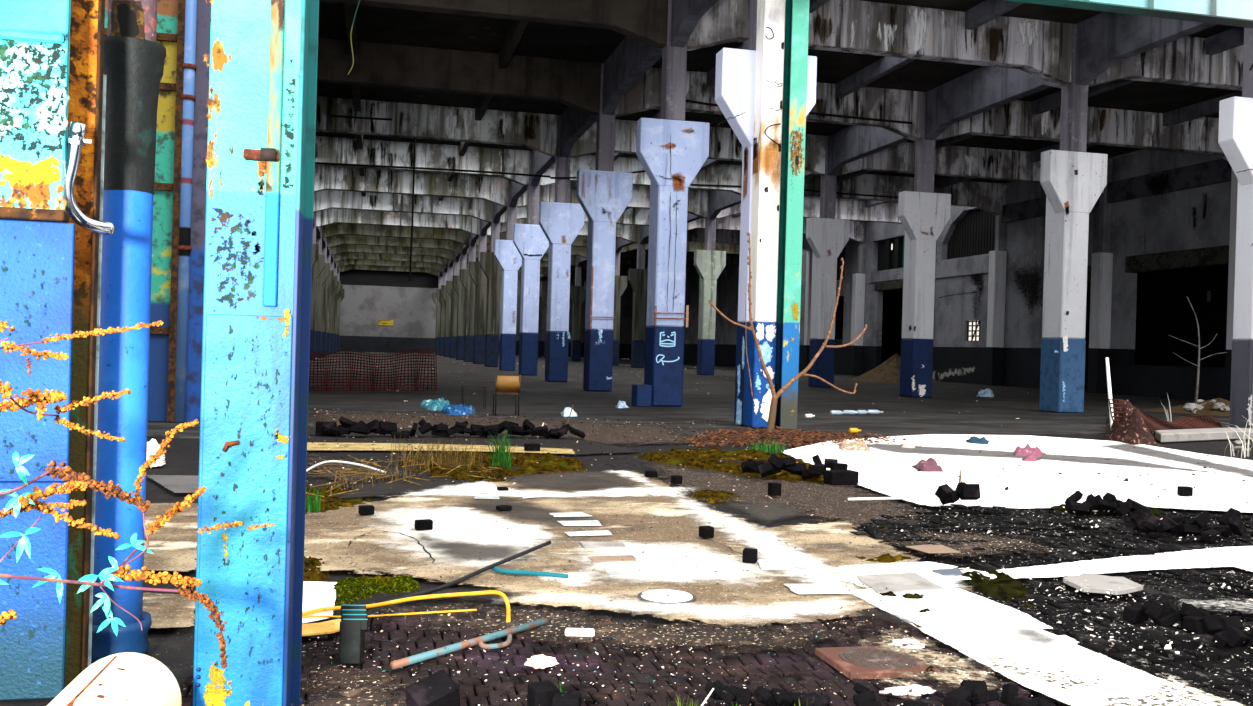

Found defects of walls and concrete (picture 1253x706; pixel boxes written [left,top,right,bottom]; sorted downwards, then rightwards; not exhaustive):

corrosion [203,38,232,71]
leakage [809,13,832,43]
leakage [878,6,897,51]
leakage [957,26,1005,61]
peeling [0,31,69,160]
leakage [817,90,863,118]
corrosion [206,86,233,198]
corrosion [672,173,685,191]
corrosion [743,127,805,198]
peeling [209,208,263,312]
peeling [736,323,776,425]
spalling [206,325,289,680]